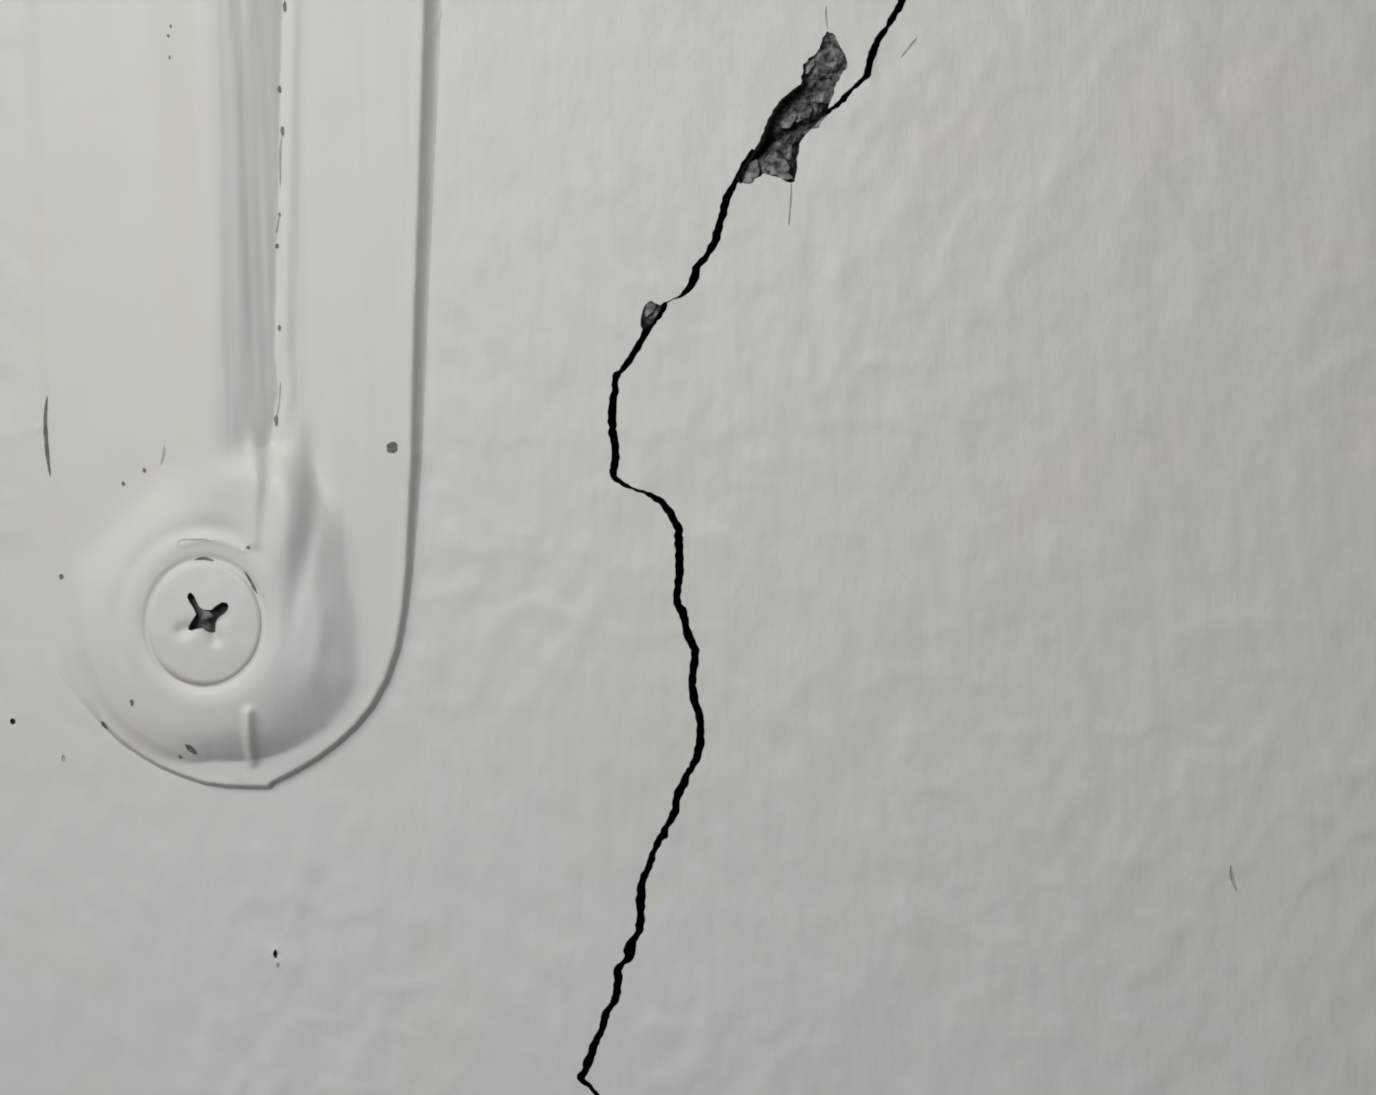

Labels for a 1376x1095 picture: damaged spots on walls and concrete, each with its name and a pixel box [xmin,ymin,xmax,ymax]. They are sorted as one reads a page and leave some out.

spalling [737,31,847,184]
crack [825,0,906,115]
crack [786,183,794,225]
crack [577,149,760,1095]